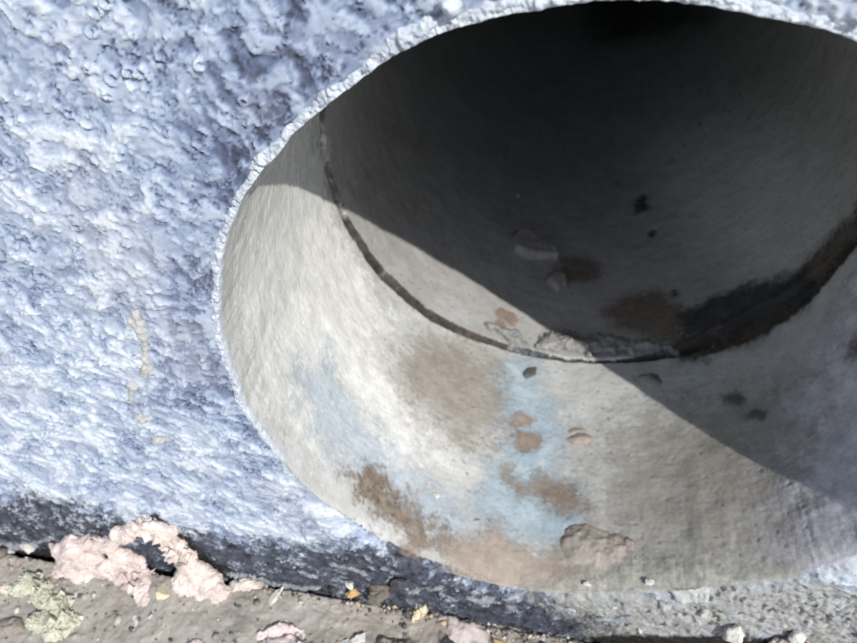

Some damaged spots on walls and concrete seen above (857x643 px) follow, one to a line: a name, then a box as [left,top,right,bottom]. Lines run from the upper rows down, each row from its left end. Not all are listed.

rust [555,257,602,283]
rust [601,291,682,341]
leakage [676,267,815,340]
leakage [761,273,857,573]
leakage [0,493,125,563]
leakage [119,537,177,577]
rust [345,466,454,558]
leakage [181,529,626,643]